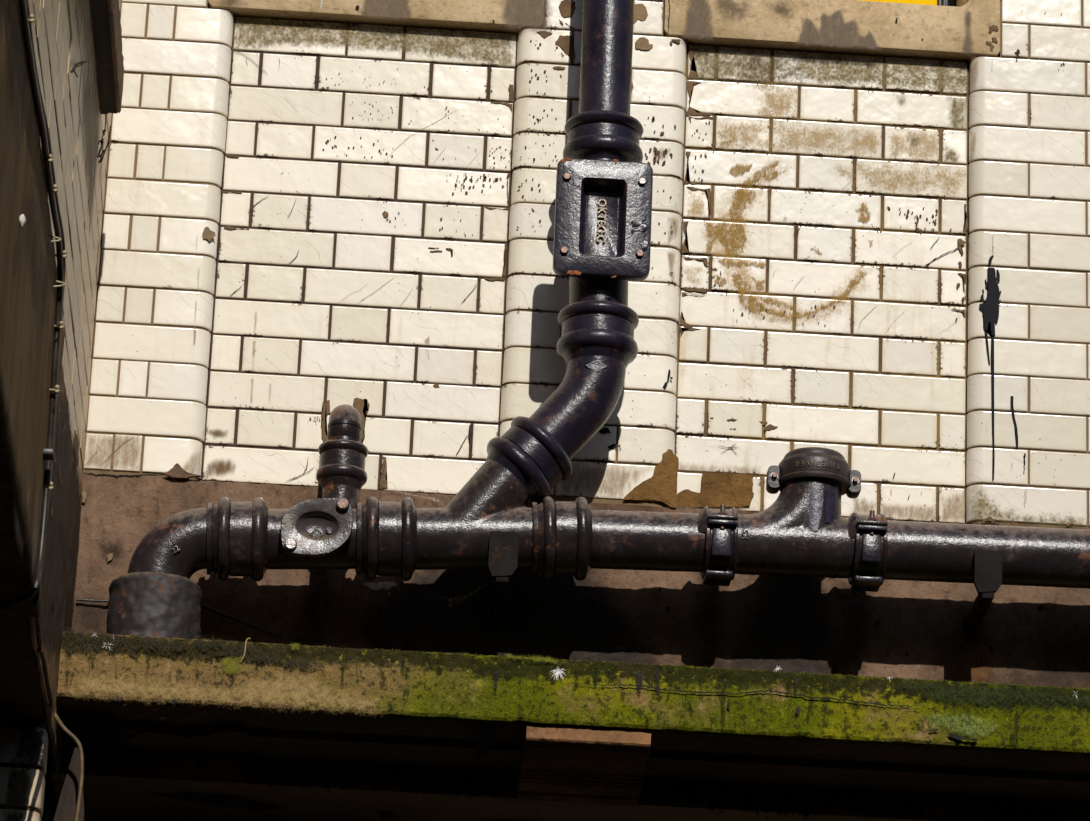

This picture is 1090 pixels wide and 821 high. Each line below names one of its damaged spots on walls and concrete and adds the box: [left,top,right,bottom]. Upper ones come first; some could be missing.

leakage [798,11,877,49]
leakage [750,57,793,116]
leakage [781,127,879,152]
leakage [865,169,961,194]
leakage [856,202,870,227]
leakage [688,161,866,320]
spalling [308,400,330,442]
spalling [353,398,370,444]
spalling [623,449,754,508]
leakage [731,576,836,675]
leakage [78,675,378,710]
leakage [4,726,45,821]